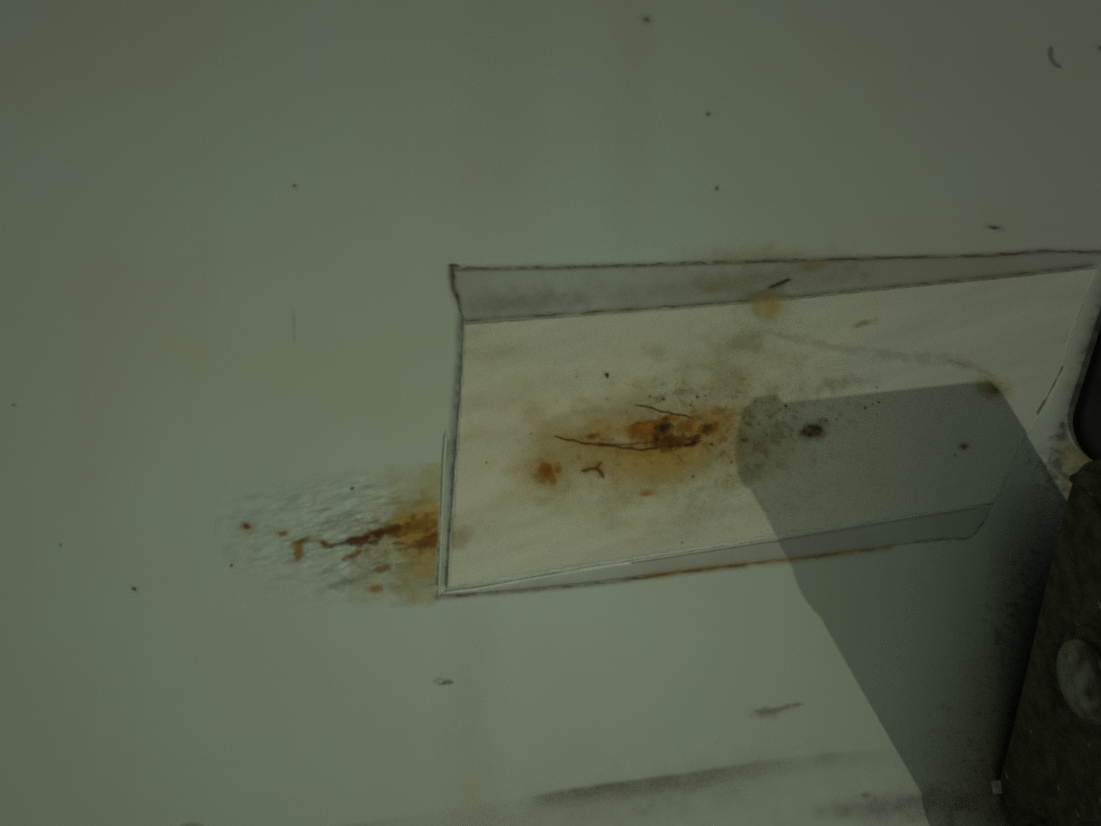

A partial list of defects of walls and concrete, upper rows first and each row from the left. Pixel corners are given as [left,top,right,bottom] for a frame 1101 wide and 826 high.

corrosion [454,314,805,559]
corrosion [279,531,308,560]
corrosion [321,485,439,586]